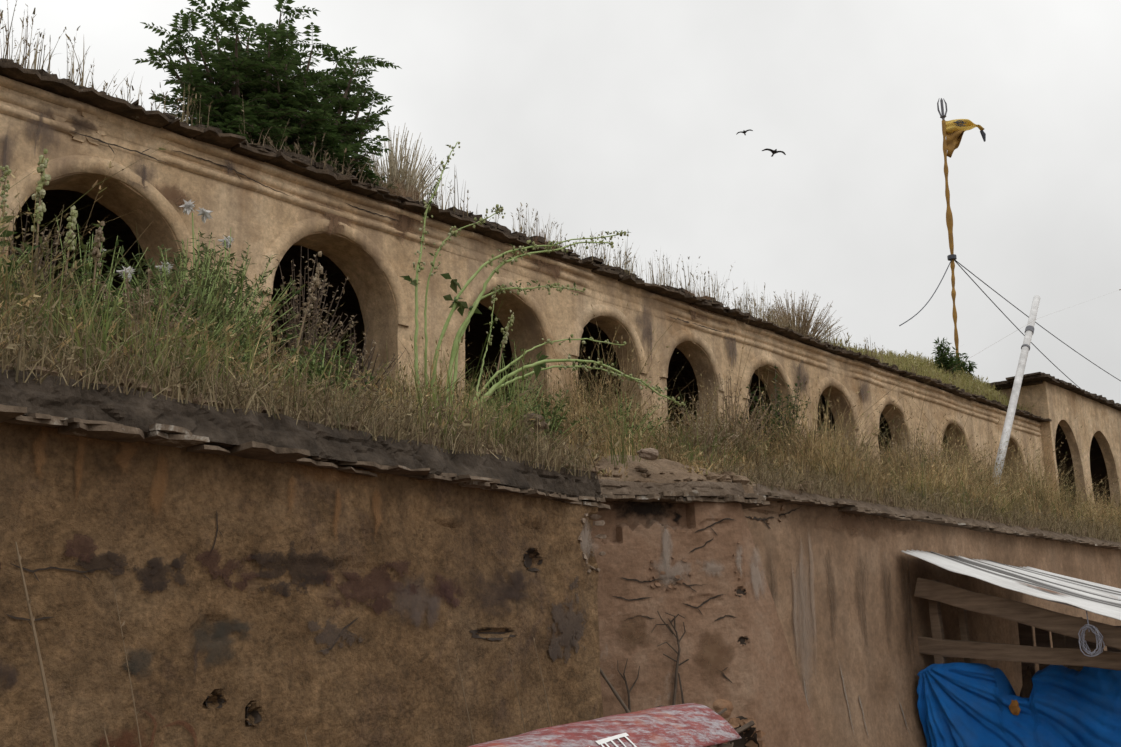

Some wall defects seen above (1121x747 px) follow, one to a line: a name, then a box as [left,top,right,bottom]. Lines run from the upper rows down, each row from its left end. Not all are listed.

spalling [578,501,681,573]